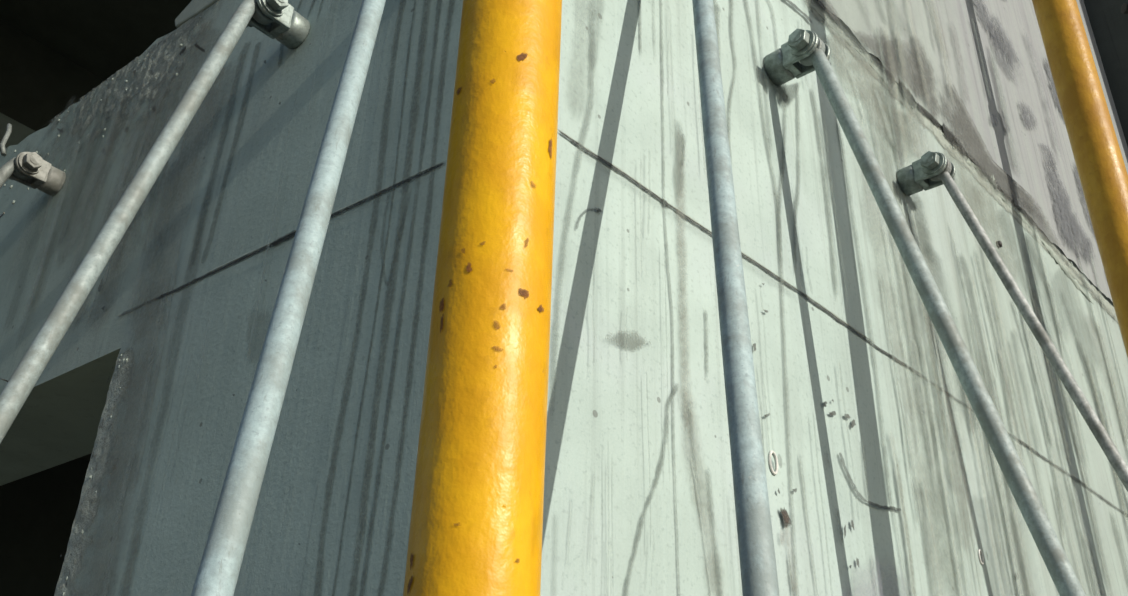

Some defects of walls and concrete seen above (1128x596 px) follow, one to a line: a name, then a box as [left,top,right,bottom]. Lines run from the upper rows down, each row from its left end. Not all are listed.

water stain [166,46,259,259]
water stain [715,0,752,61]
water stain [761,81,837,309]
water stain [863,36,1039,214]
water stain [974,0,1019,74]
water stain [1045,162,1094,262]
water stain [624,140,688,596]
crack [839,453,900,511]
water stain [989,445,1031,596]
water stain [1013,305,1108,594]